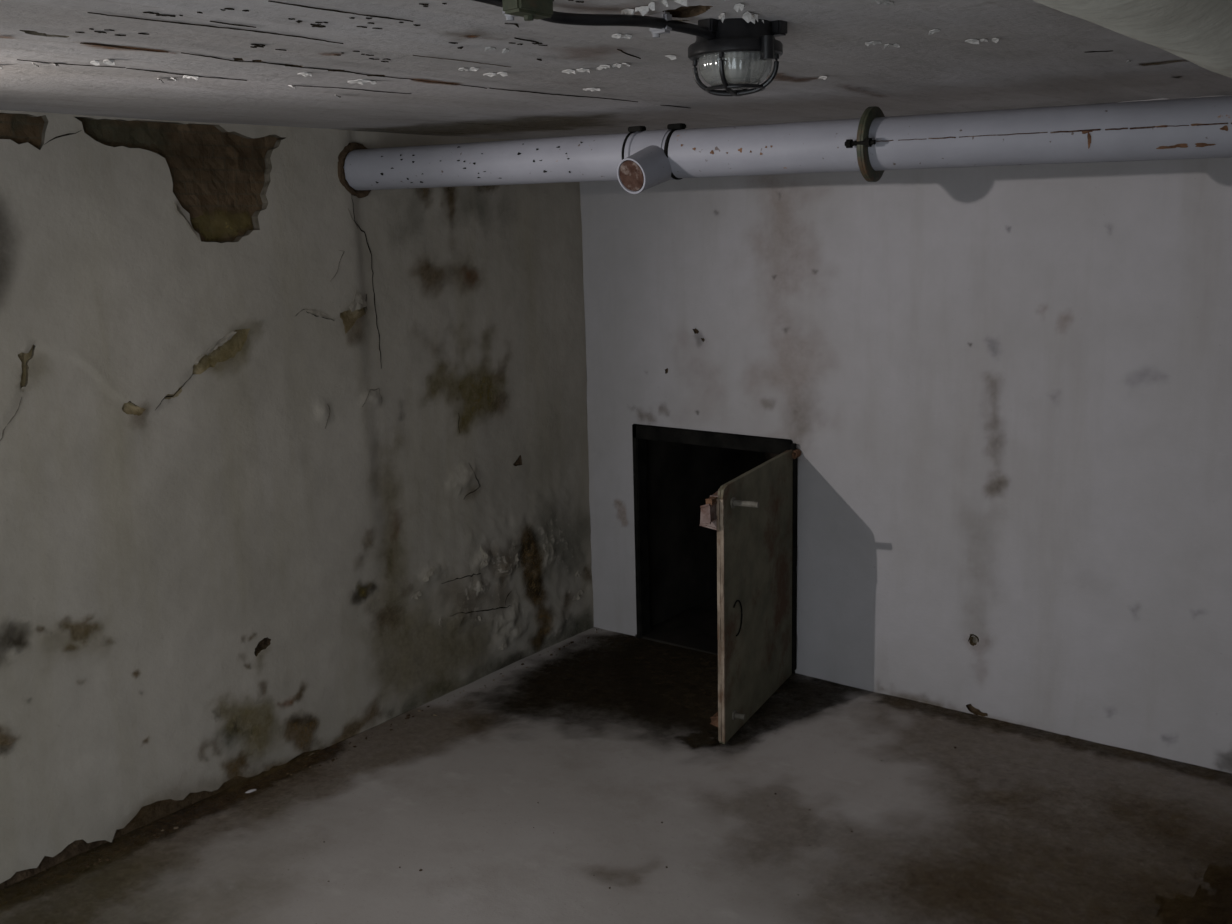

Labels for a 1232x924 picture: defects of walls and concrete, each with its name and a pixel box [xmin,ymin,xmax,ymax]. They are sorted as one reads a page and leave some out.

spalling [0,113,49,150]
spalling [75,117,286,243]
spalling [0,705,377,890]